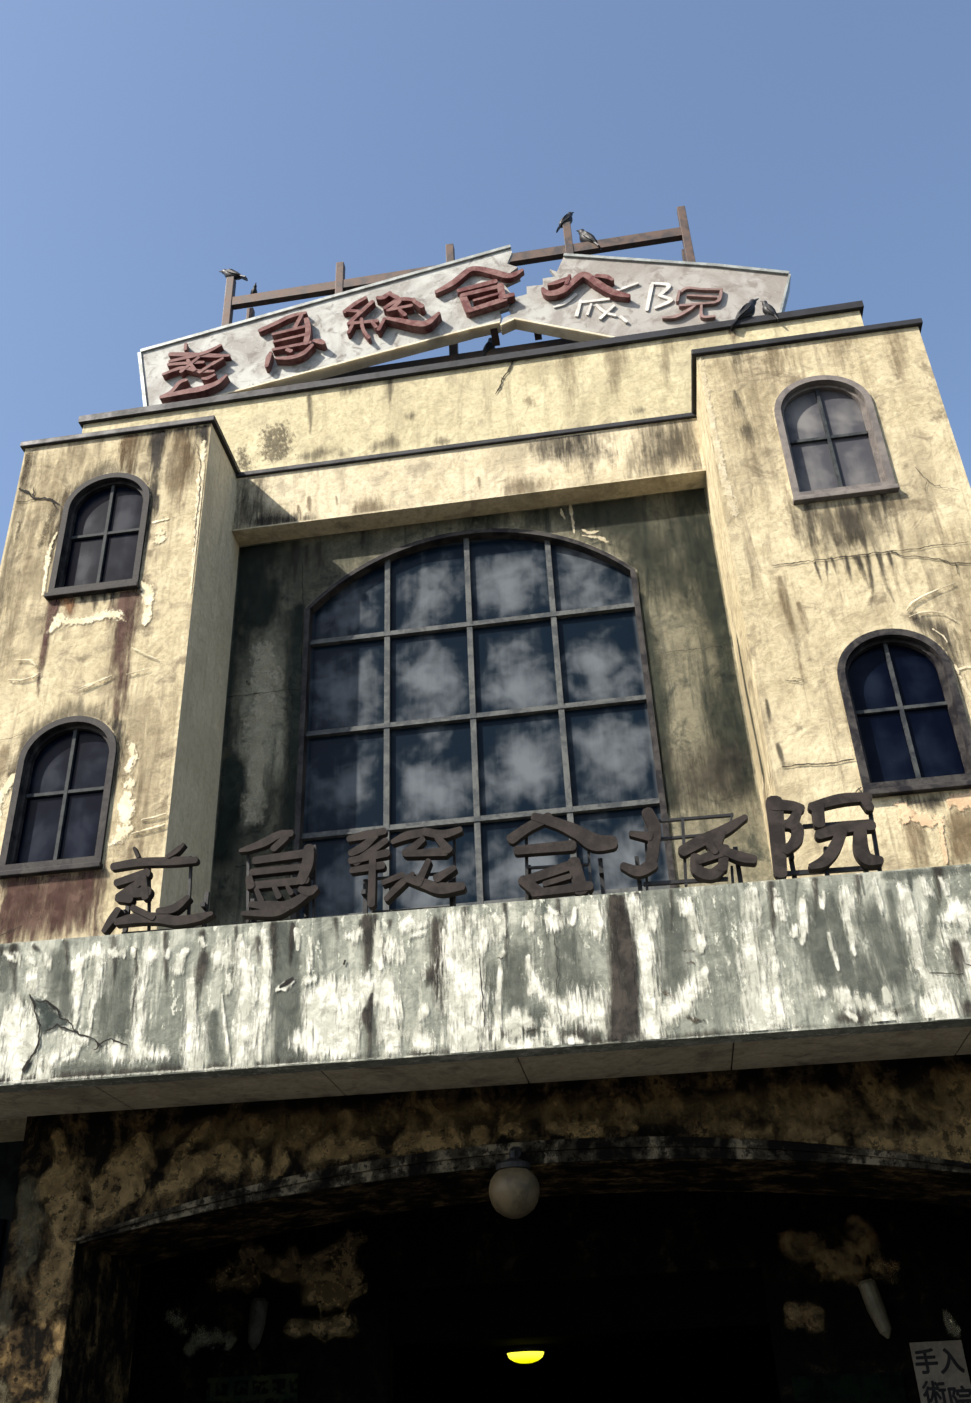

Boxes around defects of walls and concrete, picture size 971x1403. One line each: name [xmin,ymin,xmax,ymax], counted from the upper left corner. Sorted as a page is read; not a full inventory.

crack [495,361,514,394]
crack [17,488,60,509]
flaking render [49,609,124,632]
damp [213,542,321,864]
flaking render [108,741,139,846]
rust [0,869,105,943]
crack [22,994,128,1072]
damp [255,921,307,1066]
damp [411,889,798,1056]
peeling [737,886,898,1032]
damp [796,866,971,1026]
peeling [875,790,971,1021]